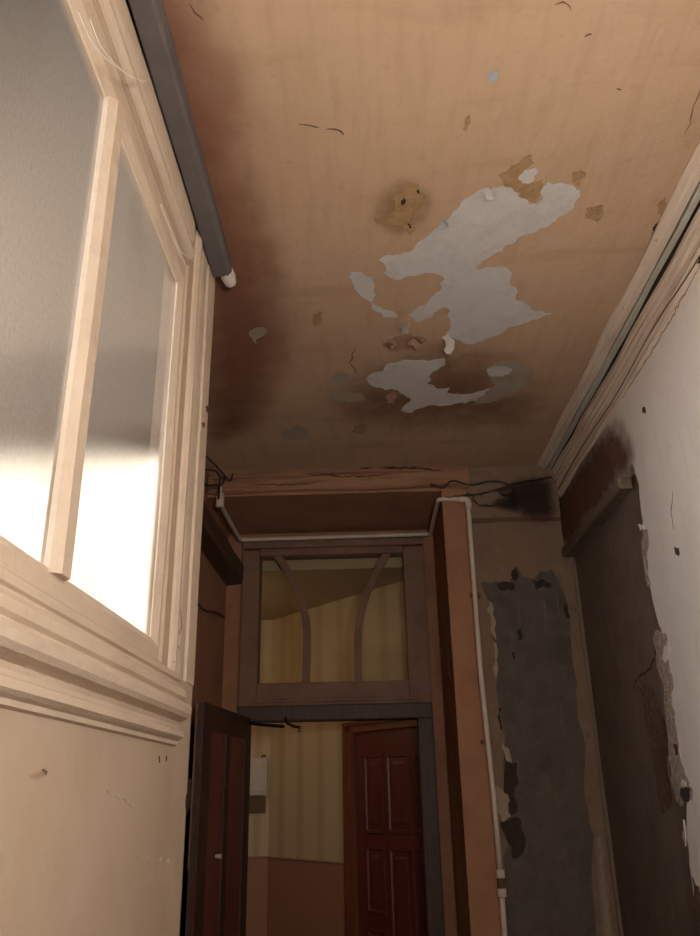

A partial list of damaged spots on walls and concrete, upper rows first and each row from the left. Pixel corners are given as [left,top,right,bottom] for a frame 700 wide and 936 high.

peeling [348,155,586,413]
spalling [585,205,604,222]
flaking render [638,524,651,588]
flaking render [481,567,596,936]
flaking render [633,630,693,813]